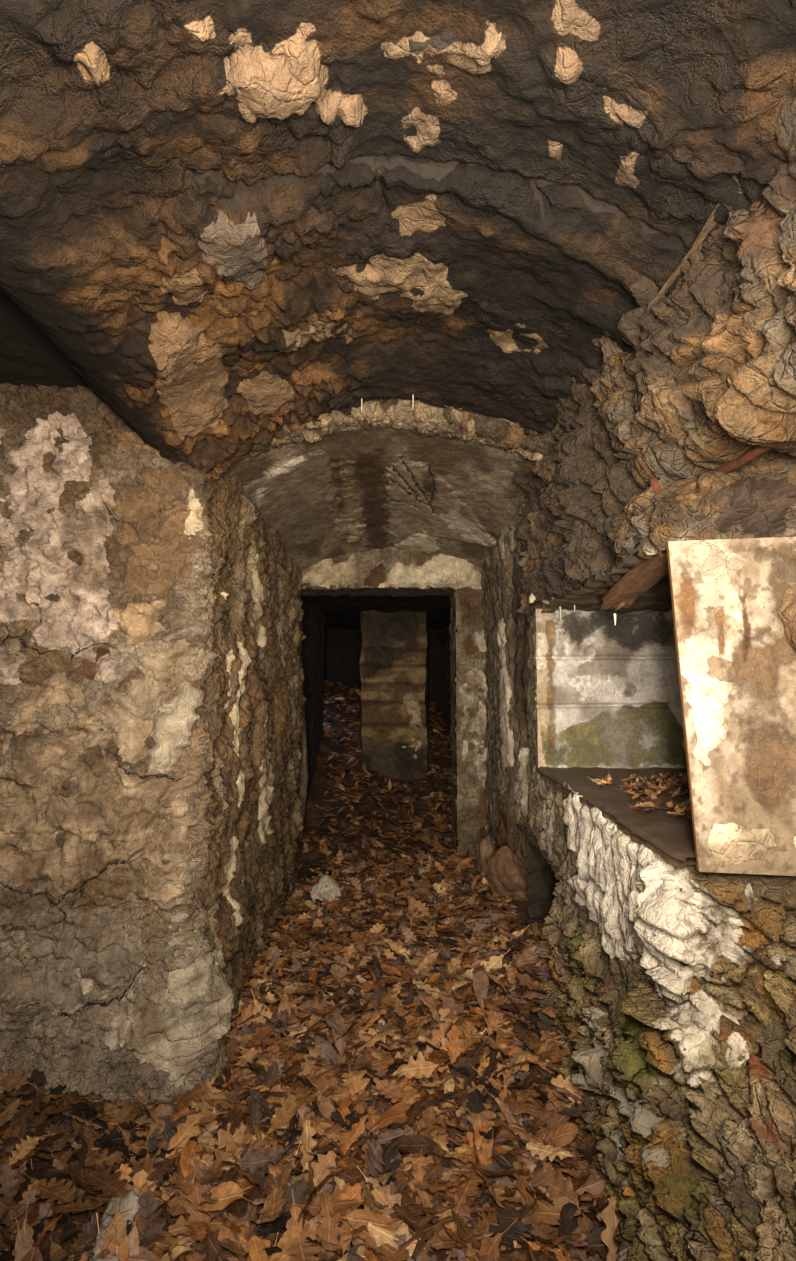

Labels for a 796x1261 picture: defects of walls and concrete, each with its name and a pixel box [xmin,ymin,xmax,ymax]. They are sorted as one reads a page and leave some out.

leakage [331,449,438,551]
leakage [439,510,496,548]
flaking render [0,411,235,1087]
crack [116,756,192,782]
crack [0,850,143,925]
crack [58,962,149,1016]
leakage [563,791,796,1204]